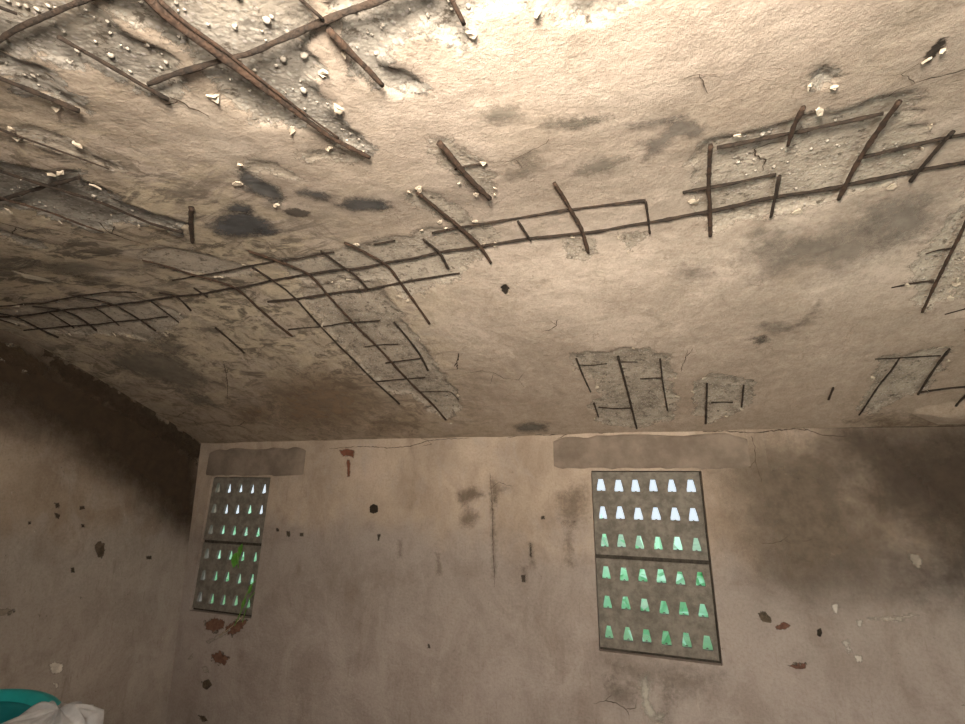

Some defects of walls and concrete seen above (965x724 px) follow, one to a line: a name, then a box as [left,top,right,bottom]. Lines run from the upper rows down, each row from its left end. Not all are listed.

spalling [920,37,947,65]
spalling [806,64,843,92]
spalling [0,0,636,208]
damp [211,202,278,237]
damp [239,169,310,217]
damp [296,189,392,212]
spalling [0,88,965,429]
damp [0,332,212,529]
rust [339,449,355,477]
damp [743,452,882,587]
damp [836,419,965,580]